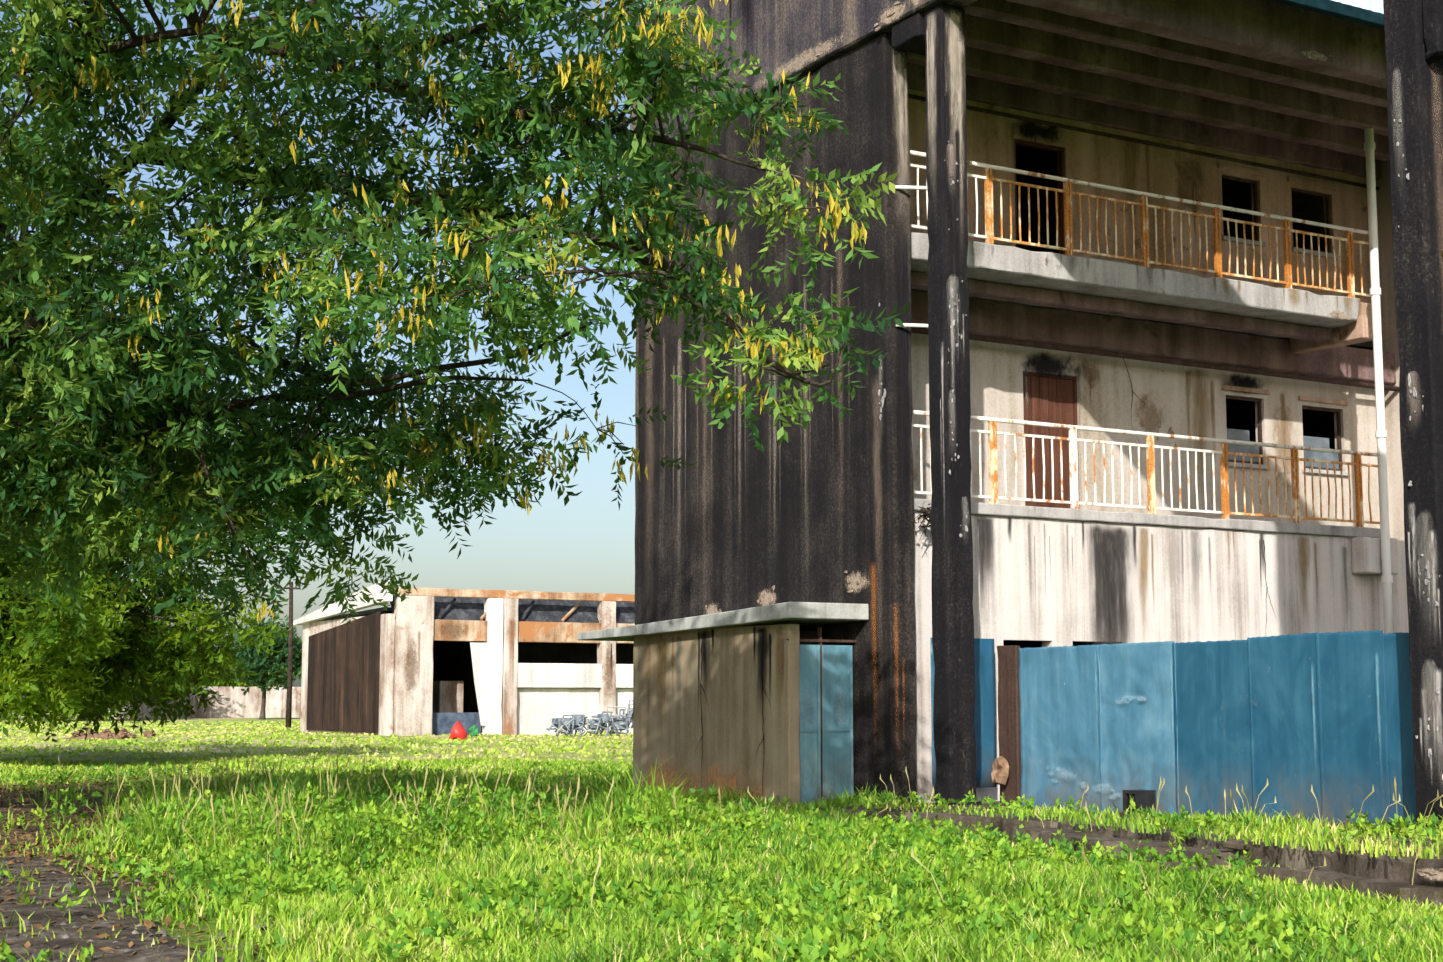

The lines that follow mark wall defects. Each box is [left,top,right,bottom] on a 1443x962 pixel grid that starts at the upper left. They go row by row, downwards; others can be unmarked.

spalling [874,0,920,32]
leakage [673,345,686,440]
spalling [844,571,869,593]
leakage [978,518,1011,583]
leakage [1082,523,1153,645]
leakage [1300,538,1317,588]
peeling [1408,504,1440,622]
leakage [753,627,784,690]
peeling [1415,663,1443,780]